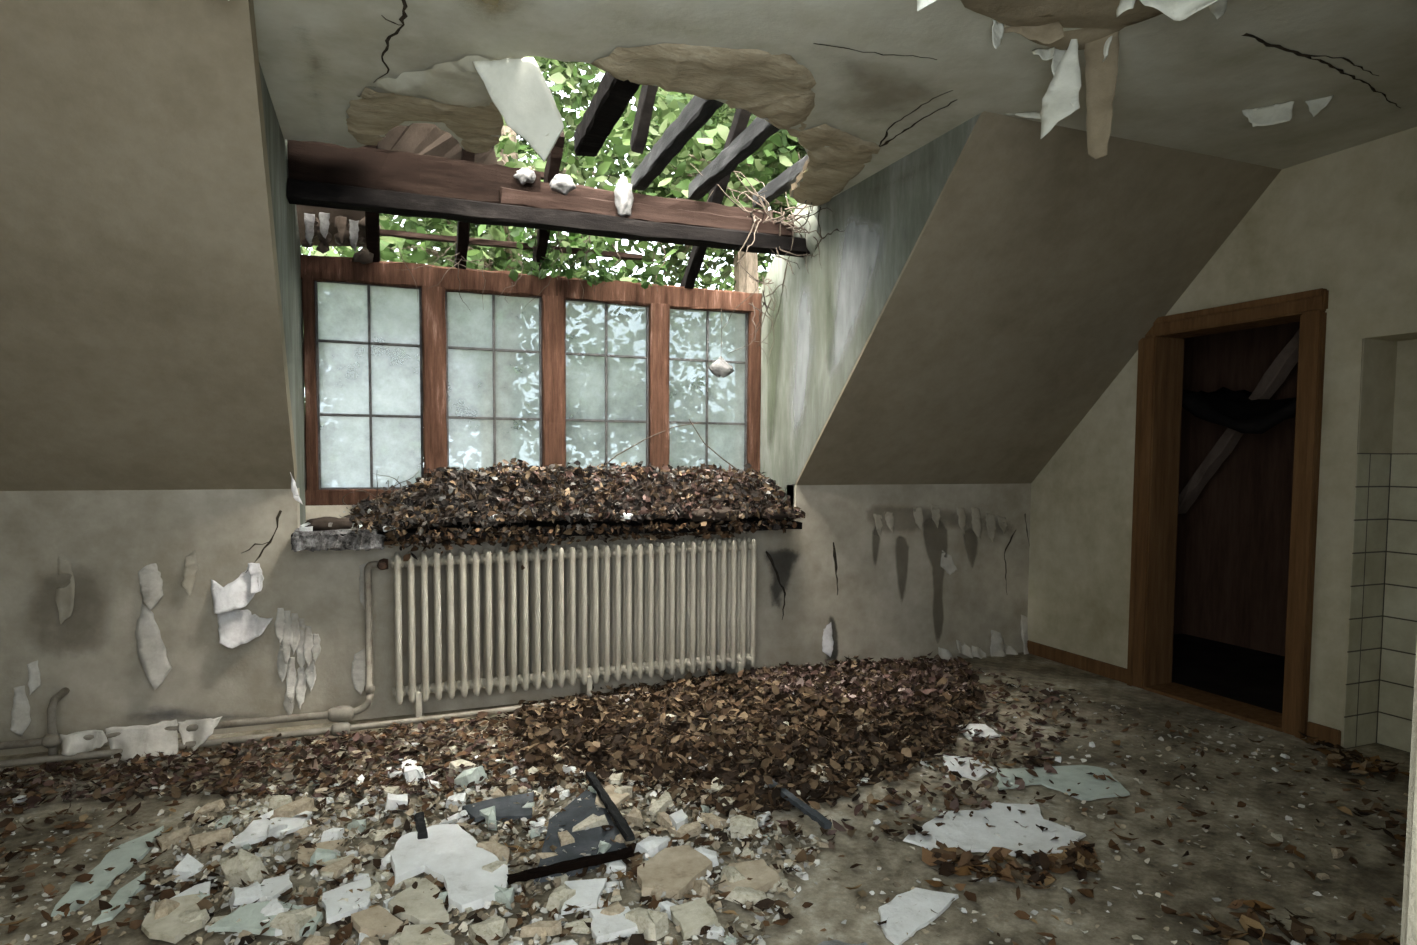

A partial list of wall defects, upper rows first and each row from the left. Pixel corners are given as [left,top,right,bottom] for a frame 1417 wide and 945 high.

crack [375,0,408,81]
spalling [346,55,504,153]
spalling [591,43,880,205]
crack [1242,33,1400,108]
peeling [135,563,172,690]
peeling [181,550,321,715]
crack [242,510,282,573]
water stain [896,537,908,598]
water stain [924,518,947,639]
water stain [964,529,977,566]